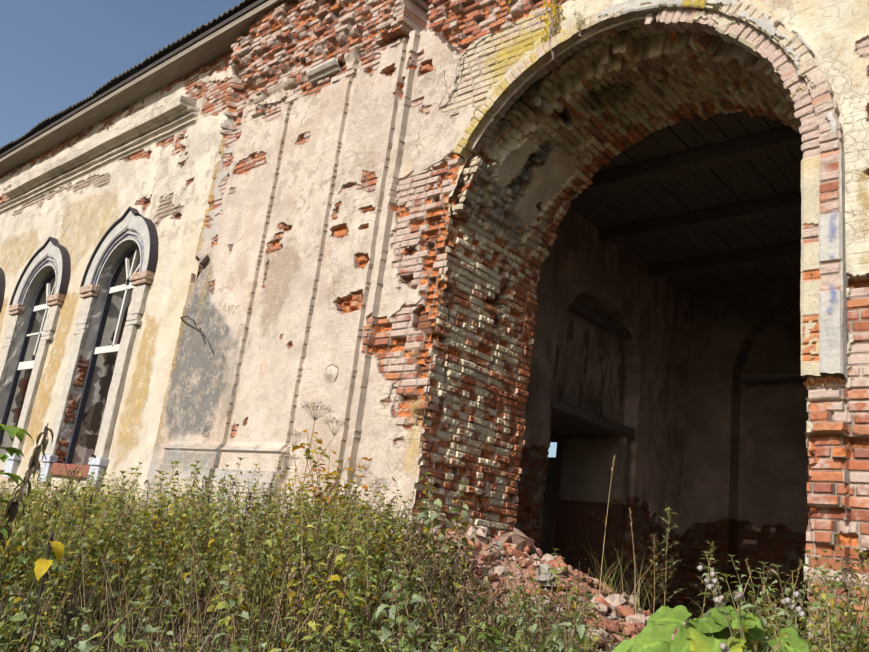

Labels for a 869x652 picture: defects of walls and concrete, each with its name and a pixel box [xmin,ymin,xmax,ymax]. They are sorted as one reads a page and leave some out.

spalling [0,0,568,296]
spalling [852,32,869,85]
flaking render [55,304,130,463]
flaking render [329,146,477,448]
flaking render [800,255,869,646]